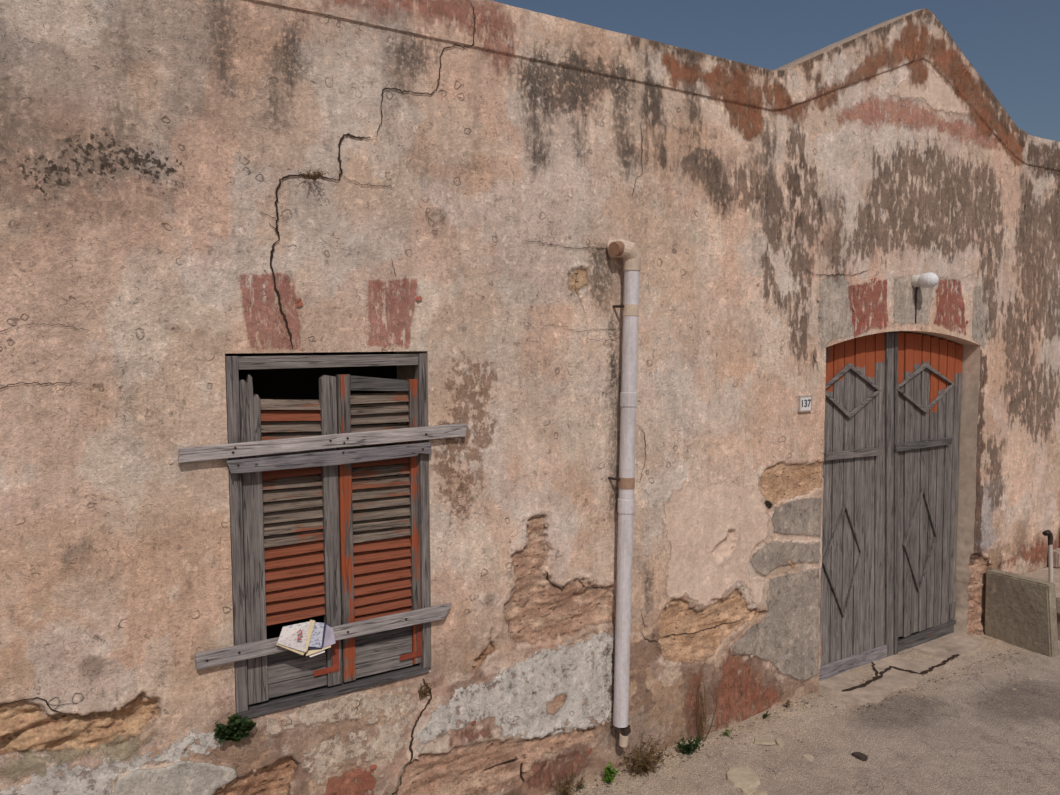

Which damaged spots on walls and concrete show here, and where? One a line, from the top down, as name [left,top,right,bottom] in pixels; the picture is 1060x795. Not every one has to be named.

water stain [0,129,184,200]
crack [259,1,476,348]
water stain [521,52,637,173]
water stain [631,35,784,168]
water stain [799,8,961,95]
water stain [592,248,611,304]
water stain [681,62,1060,564]
crack [0,381,81,389]
peeling [658,461,823,665]
peeling [213,515,616,795]
spalling [0,694,223,795]
crack [392,679,432,795]